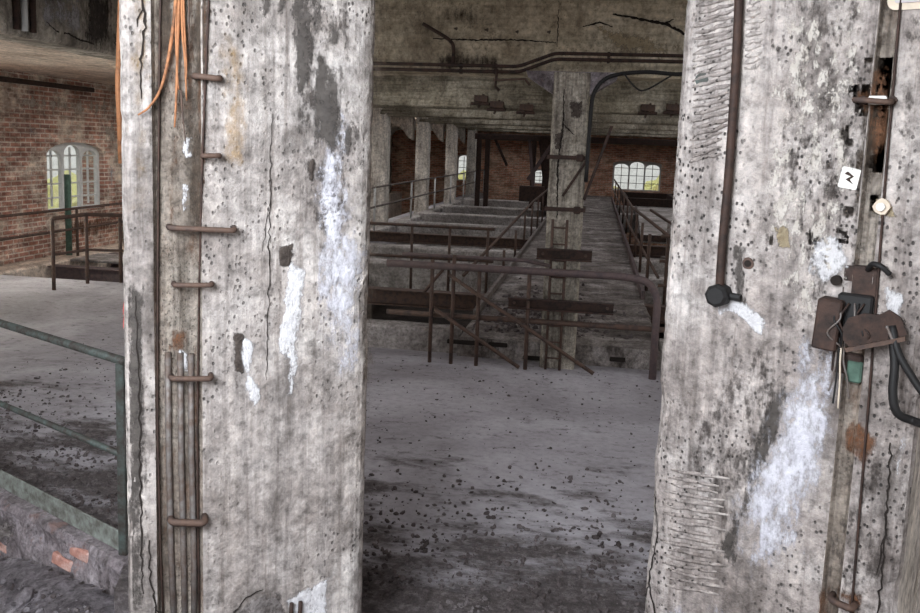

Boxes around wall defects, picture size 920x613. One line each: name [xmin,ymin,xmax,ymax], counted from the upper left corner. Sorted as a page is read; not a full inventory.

corrosion [858,72,887,154]
damp [262,0,373,381]
peeling [809,229,864,282]
corrosion [170,331,184,349]
peeling [278,244,305,394]
peeling [884,287,903,315]
peeling [233,333,260,405]
corrosion [846,423,874,462]
spalling [238,593,303,613]